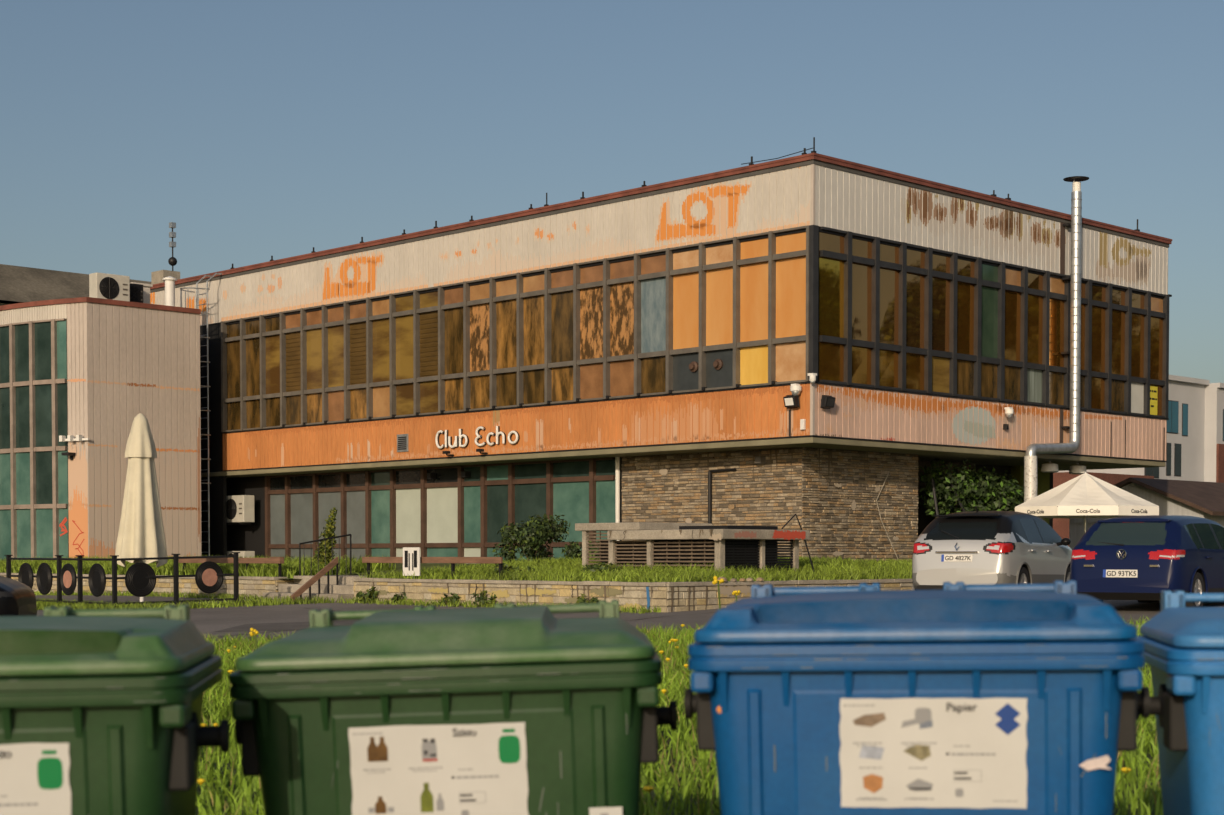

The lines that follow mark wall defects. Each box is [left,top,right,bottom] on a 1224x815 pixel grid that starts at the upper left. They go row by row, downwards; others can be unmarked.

corrosion [906,187,1066,248]